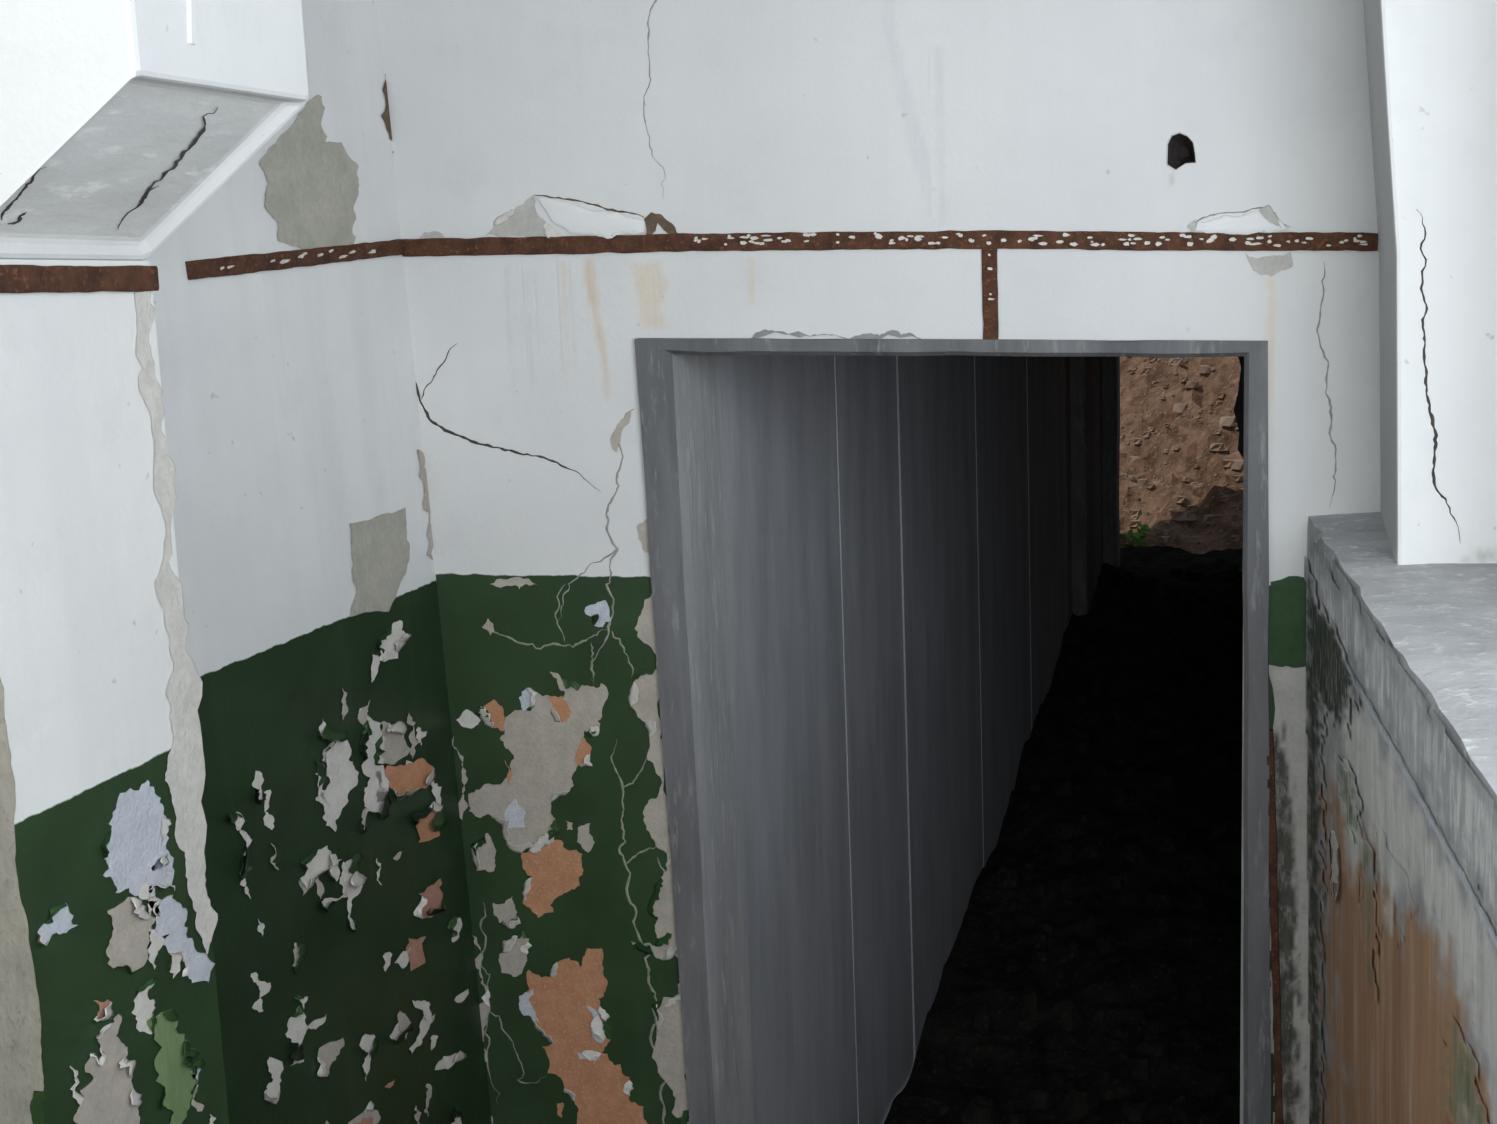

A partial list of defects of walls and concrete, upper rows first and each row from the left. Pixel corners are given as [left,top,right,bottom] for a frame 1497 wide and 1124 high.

corrosion [0,265,159,293]
crack [118,108,218,229]
spalling [260,95,359,249]
crack [416,343,634,682]
crack [643,0,665,195]
corrosion [185,230,1378,340]
corrosion [1261,274,1286,448]
crack [1416,209,1460,539]
flaking render [0,679,77,1124]
peeling [70,291,218,1124]
peeling [264,672,647,1124]
peeling [628,594,678,961]